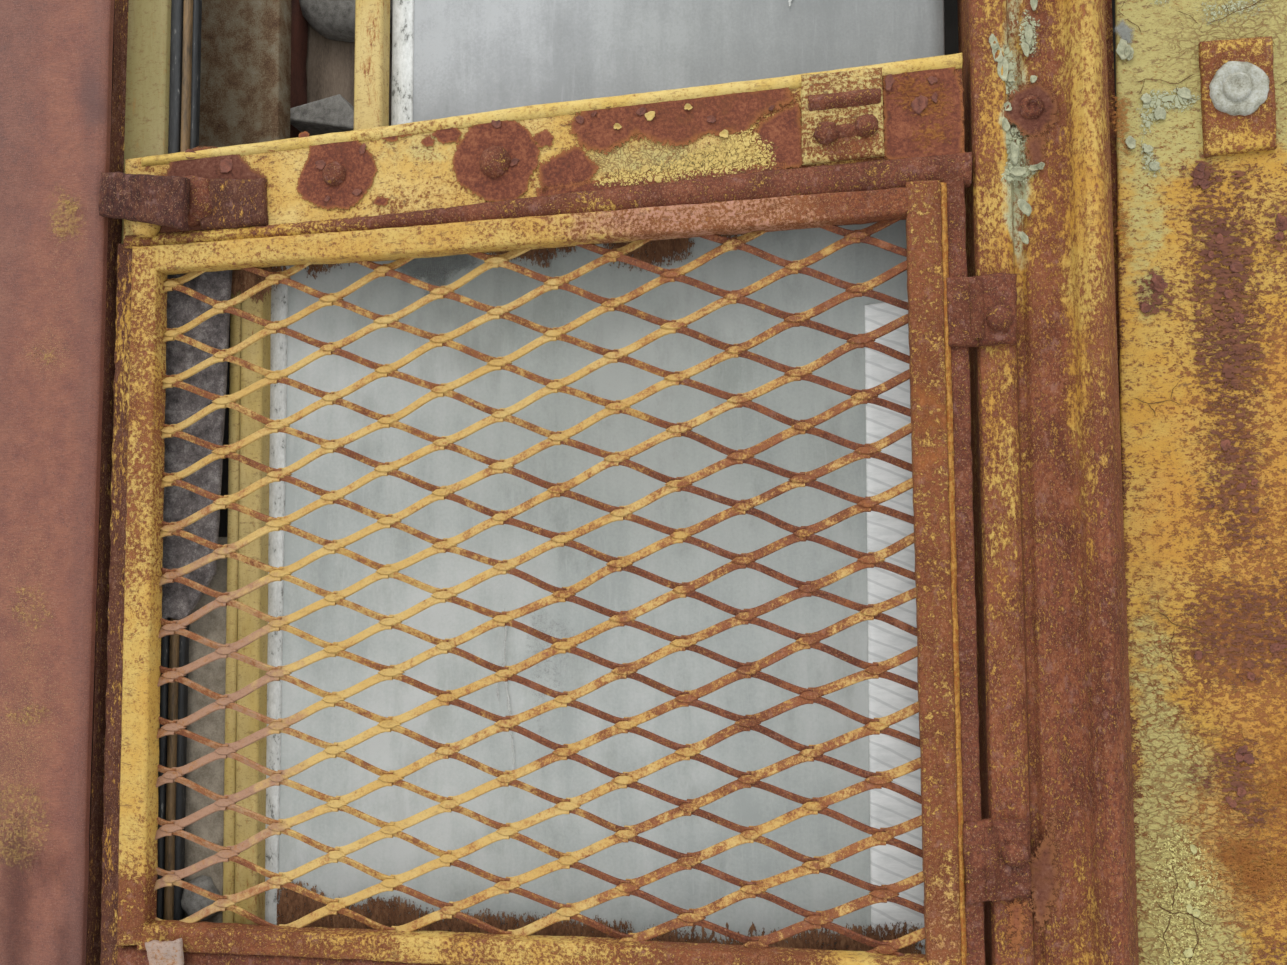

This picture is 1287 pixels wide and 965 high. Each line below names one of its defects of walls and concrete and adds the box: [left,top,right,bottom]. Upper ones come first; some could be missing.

peeling [1116,20,1134,61]
corrosion [165,146,267,180]
corrosion [296,131,389,211]
corrosion [382,87,802,202]
peeling [594,127,776,188]
peeling [989,0,1045,216]
peeling [1125,86,1200,178]
corrosion [603,238,695,272]
corrosion [1133,153,1287,690]
corrosion [277,881,925,954]
peeling [1145,824,1223,965]
crack [1158,866,1210,960]